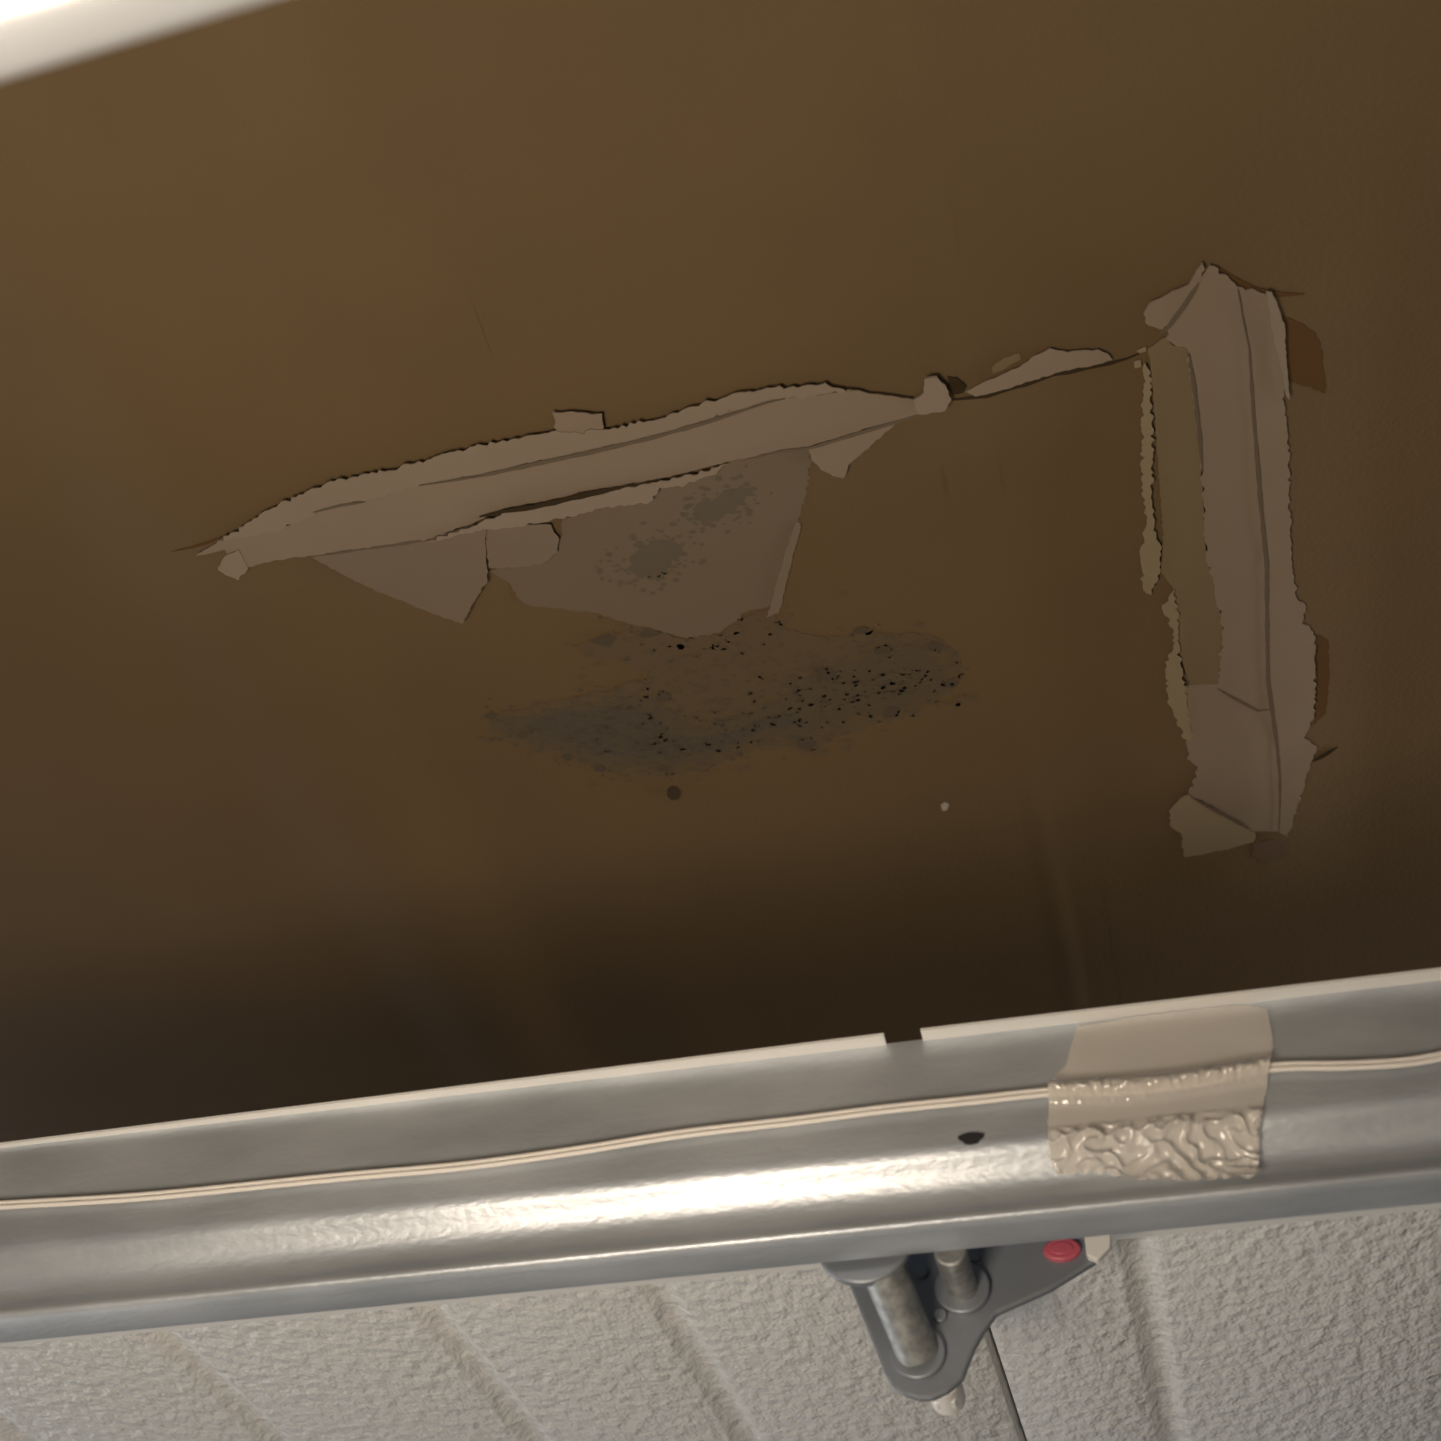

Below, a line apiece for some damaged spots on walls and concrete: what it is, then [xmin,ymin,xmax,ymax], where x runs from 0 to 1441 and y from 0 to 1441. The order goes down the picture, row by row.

peeling [1143,262,1205,330]
peeling [913,348,1112,415]
peeling [552,411,604,433]
peeling [218,549,248,580]
peeling [312,424,895,638]
crack [743,265,1338,833]
leakage [475,604,979,787]
peeling [1169,794,1256,857]